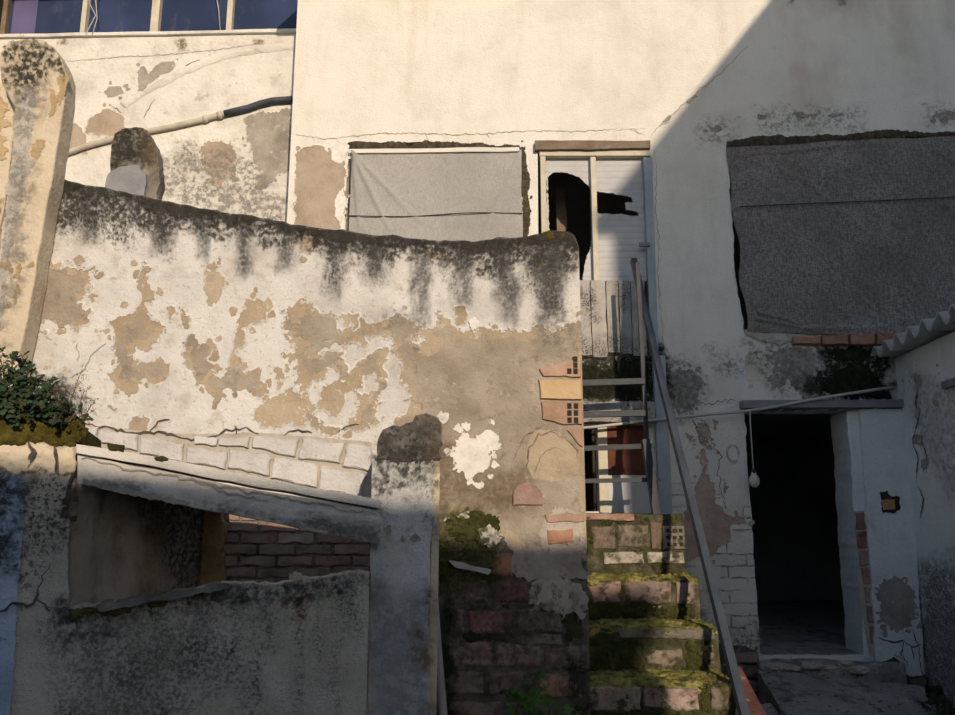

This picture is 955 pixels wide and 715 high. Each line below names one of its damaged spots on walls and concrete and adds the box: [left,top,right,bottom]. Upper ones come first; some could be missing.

leakage [2,38,65,128]
peeling [70,58,178,155]
peeling [0,73,70,330]
peeling [196,107,533,263]
crack [303,46,748,343]
peeling [36,254,104,342]
leakage [56,127,705,421]
peeling [102,257,592,715]
leakage [370,411,521,505]
crack [912,376,934,516]
crack [0,563,51,613]
leakage [46,574,378,715]